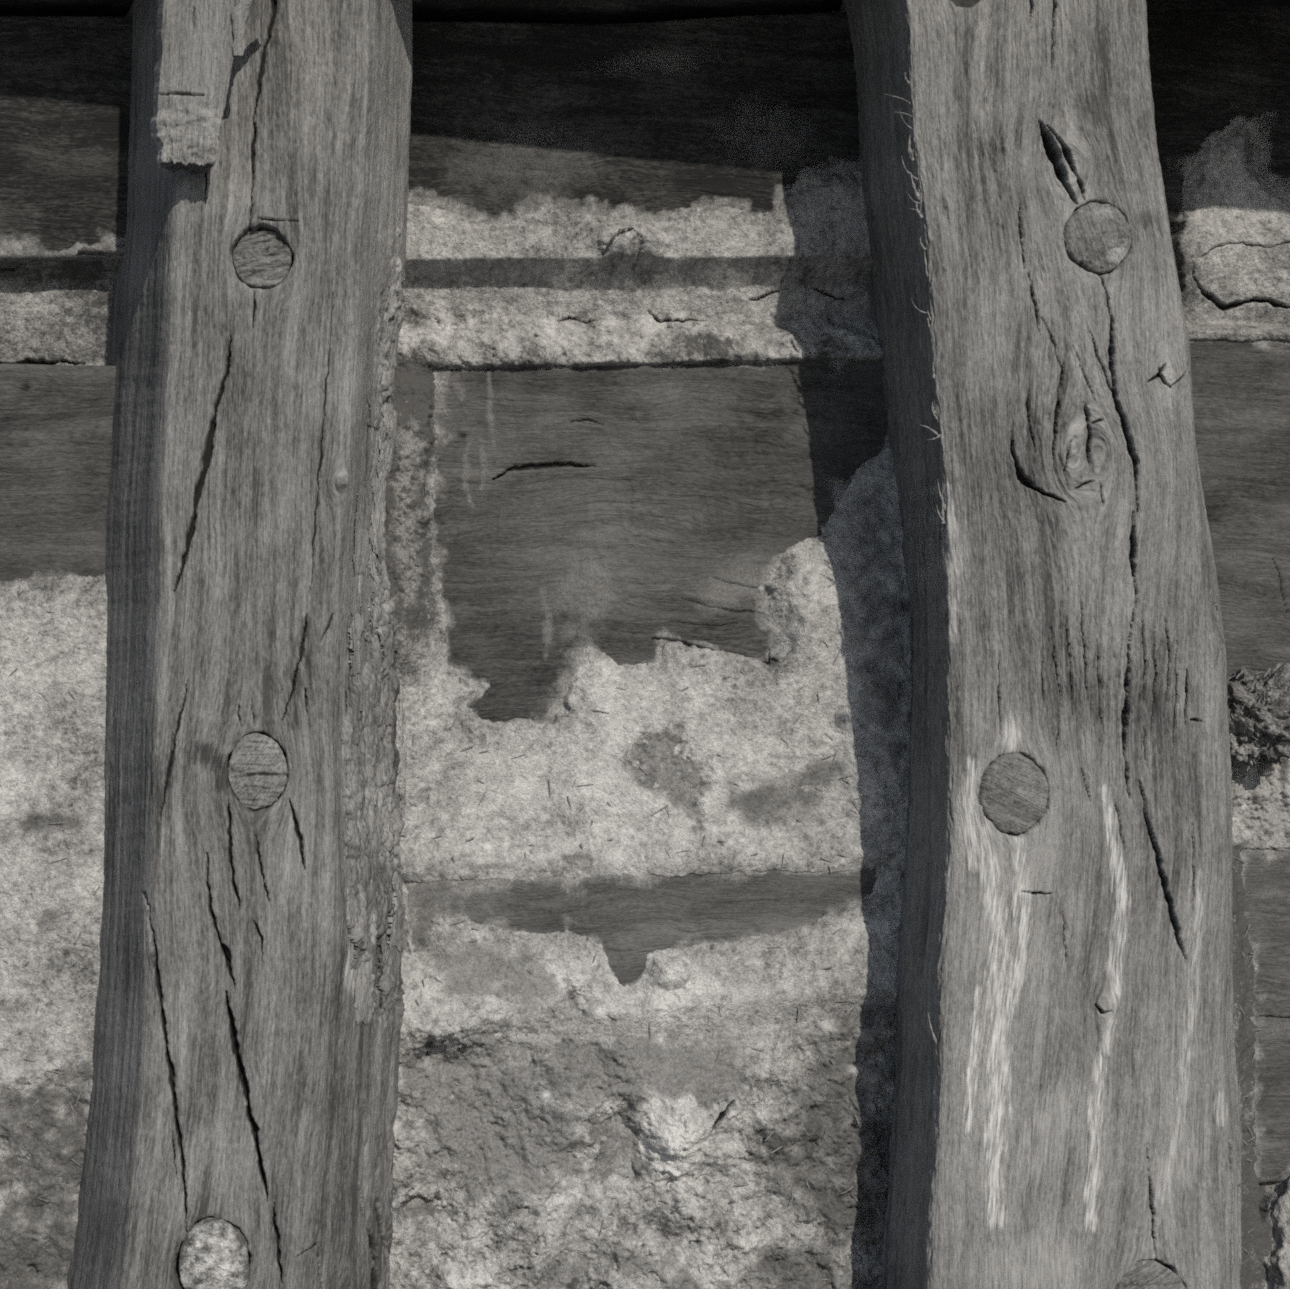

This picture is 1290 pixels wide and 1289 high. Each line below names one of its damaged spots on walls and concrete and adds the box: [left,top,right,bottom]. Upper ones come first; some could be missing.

crack [251,0,299,222]
crack [1040,130,1082,194]
crack [1192,241,1290,311]
crack [174,301,256,592]
crack [1010,211,1137,575]
crack [1148,364,1183,388]
crack [995,663,1003,731]
crack [1041,604,1199,760]
crack [1028,892,1066,956]
crack [1082,774,1195,946]
crack [155,941,187,1218]
crack [207,799,318,1281]